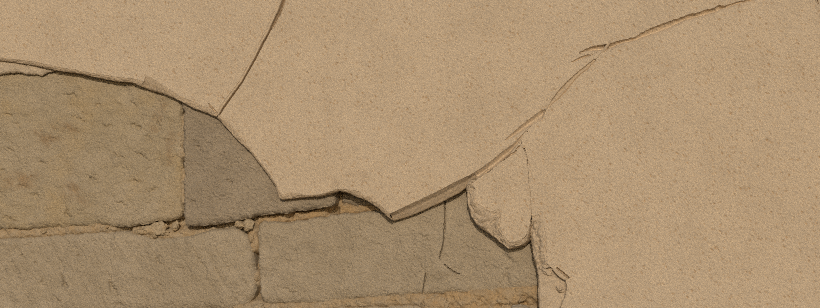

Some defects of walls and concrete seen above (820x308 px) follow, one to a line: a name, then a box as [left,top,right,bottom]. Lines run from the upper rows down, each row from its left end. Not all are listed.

crack [209,0,286,115]
spalling [0,58,573,308]
crack [474,0,754,189]